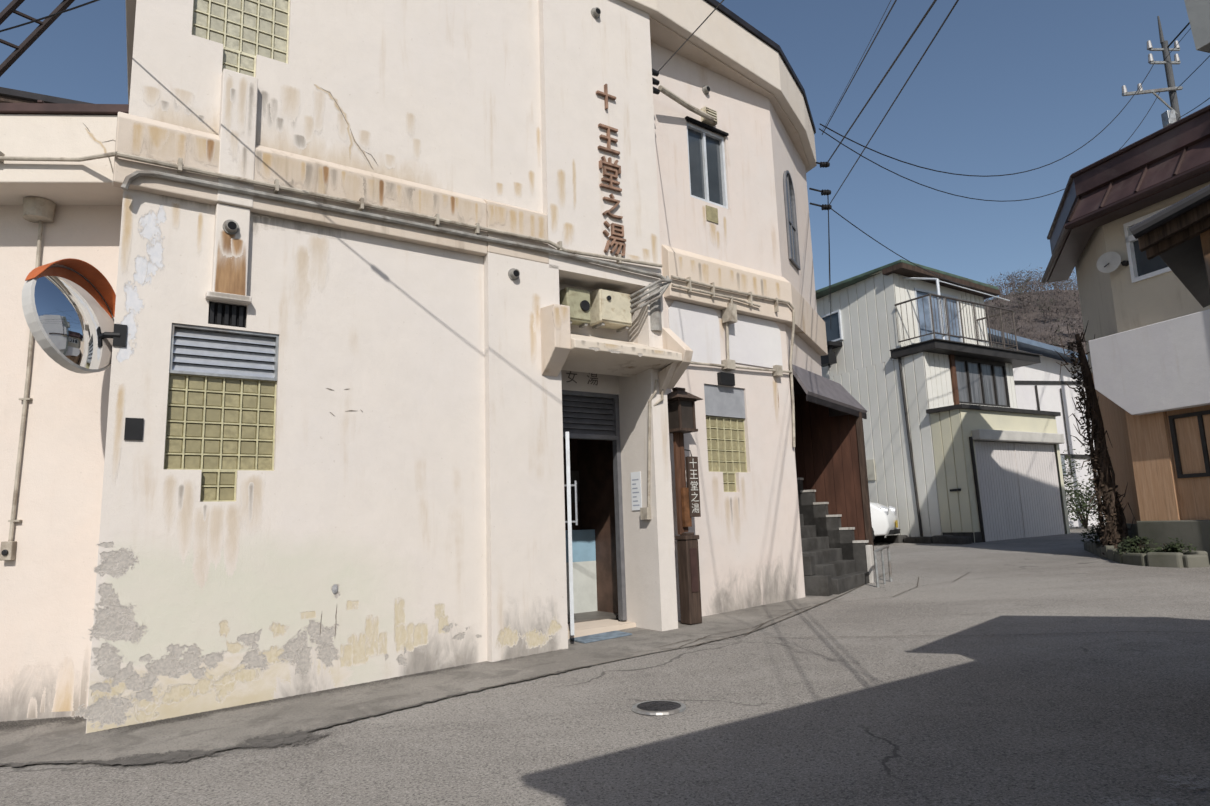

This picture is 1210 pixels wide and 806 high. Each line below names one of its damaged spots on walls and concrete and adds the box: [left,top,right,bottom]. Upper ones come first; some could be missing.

damp [142,76,483,223]
crack [314,84,378,169]
peeling [116,204,167,363]
flaking render [73,541,563,730]